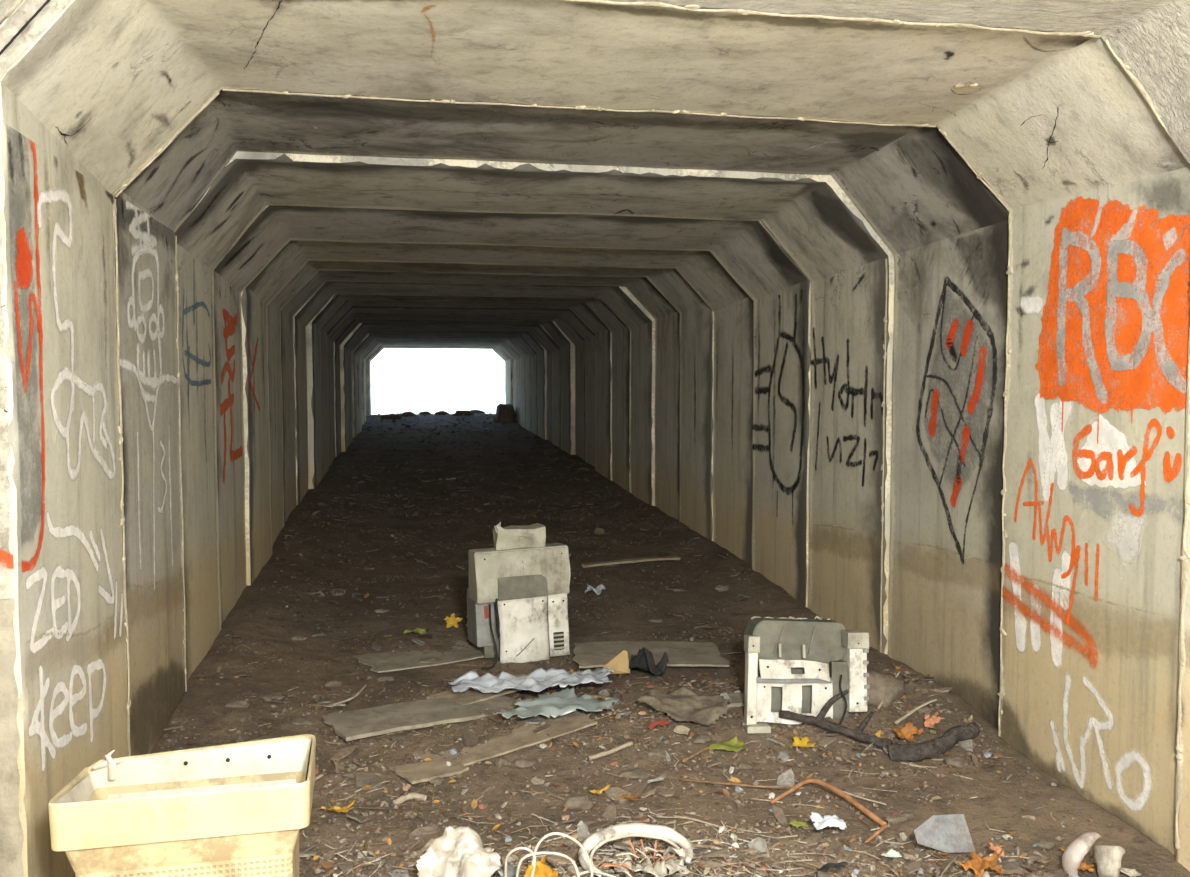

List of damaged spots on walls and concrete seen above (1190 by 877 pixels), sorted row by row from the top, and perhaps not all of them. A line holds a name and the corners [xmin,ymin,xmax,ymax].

peeling [0,0,71,79]
crack [244,0,283,70]
spalling [563,0,1169,134]